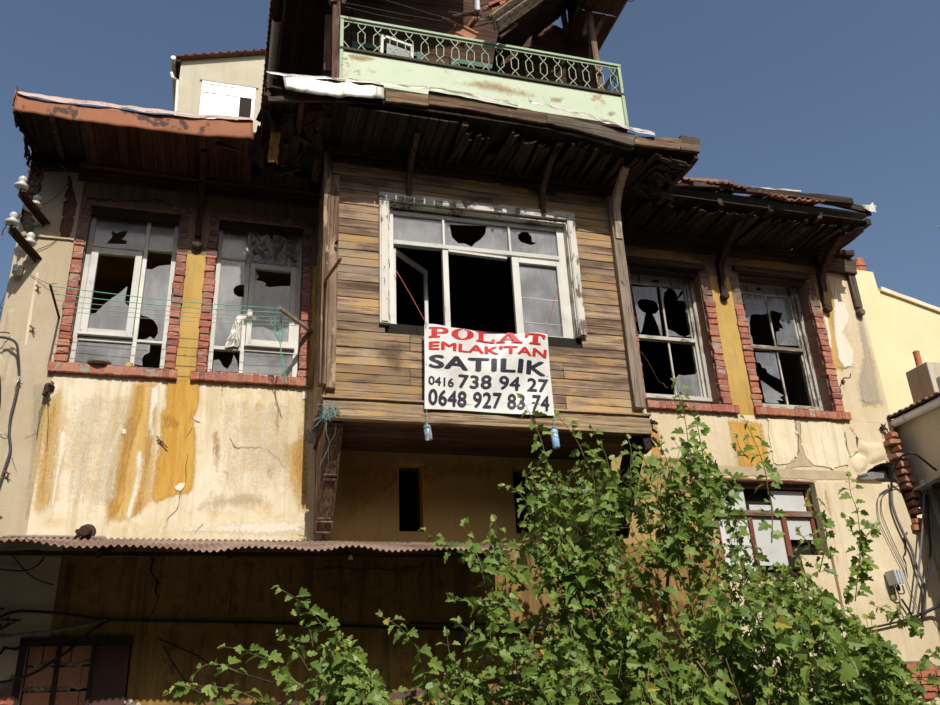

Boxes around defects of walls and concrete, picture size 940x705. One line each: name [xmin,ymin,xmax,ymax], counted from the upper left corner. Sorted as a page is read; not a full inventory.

damp [27,382,159,520]
damp [183,407,313,535]